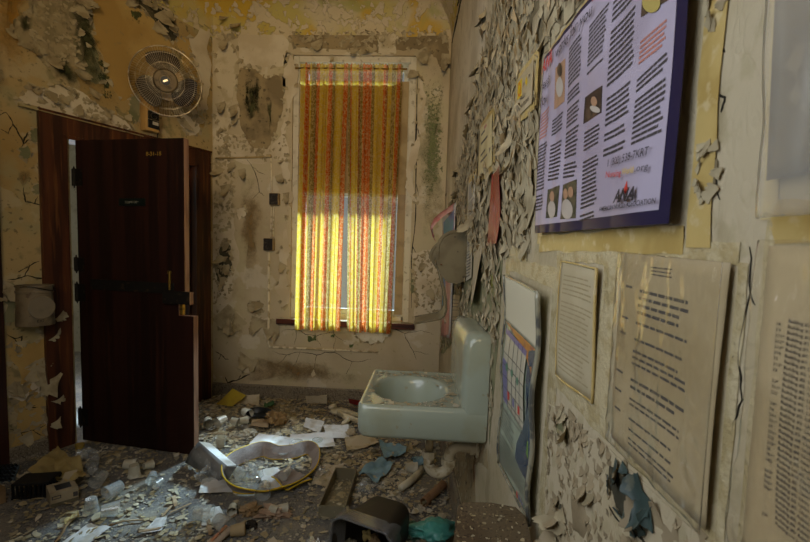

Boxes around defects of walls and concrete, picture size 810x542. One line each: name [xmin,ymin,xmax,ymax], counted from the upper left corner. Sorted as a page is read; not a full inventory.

damp [55,61,77,82]
damp [78,18,112,98]
mould [245,86,271,122]
crack [0,112,29,147]
mould [422,79,443,206]
damp [243,205,255,253]
peeling [5,0,584,542]
peeling [0,279,15,326]
crack [276,329,368,374]
peeling [531,403,709,542]
crack [609,507,645,542]